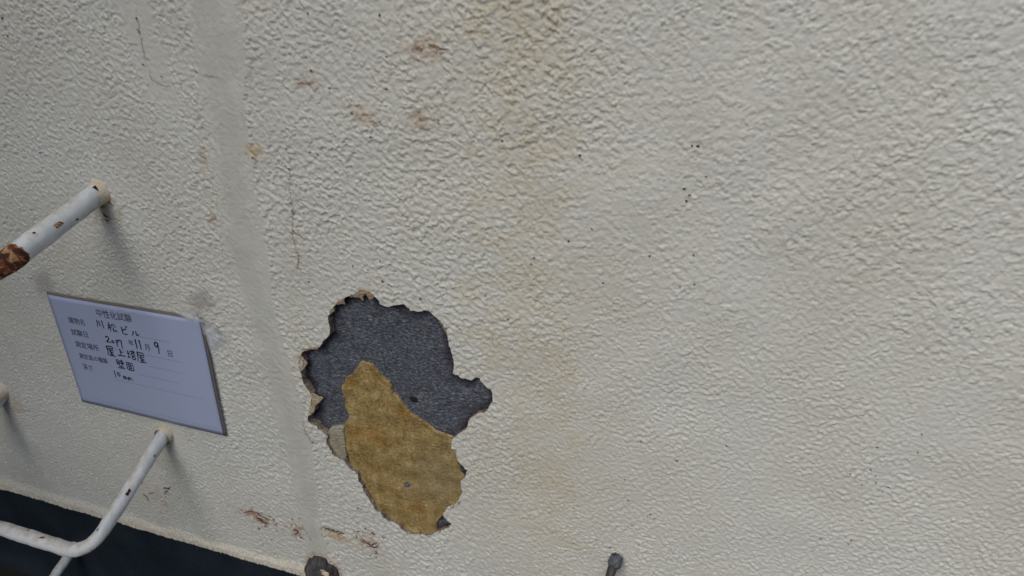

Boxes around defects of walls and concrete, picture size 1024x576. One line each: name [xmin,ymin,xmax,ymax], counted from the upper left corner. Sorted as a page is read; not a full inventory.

crack [275,148,304,272]
peeling [298,289,493,536]